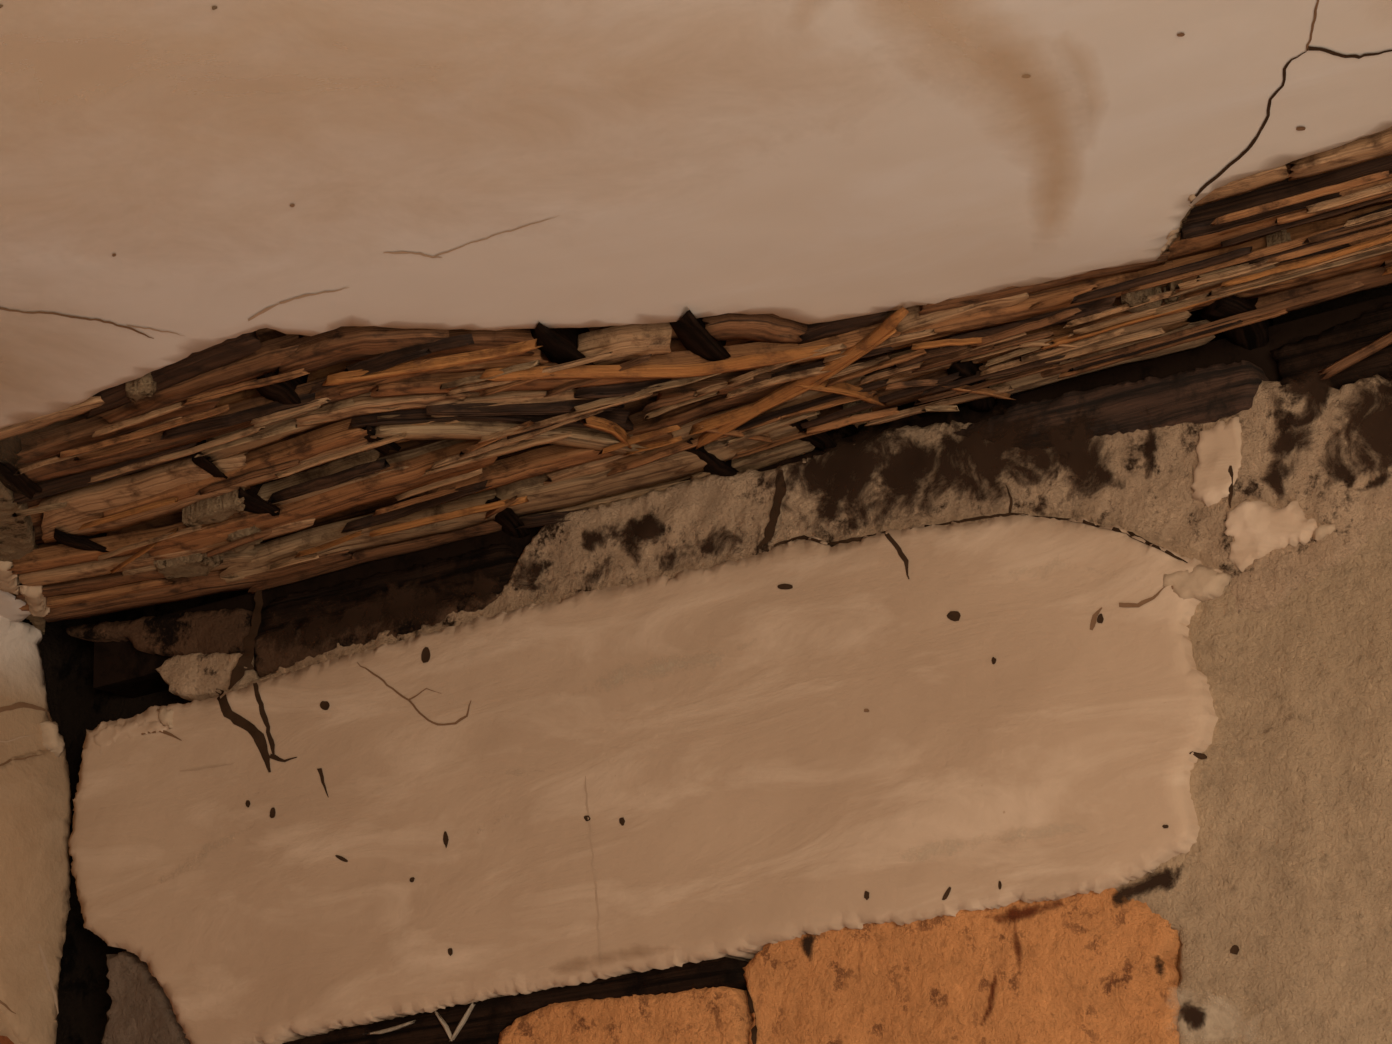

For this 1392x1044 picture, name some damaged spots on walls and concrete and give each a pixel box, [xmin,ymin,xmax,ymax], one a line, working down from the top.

crack [1190,0,1392,203]
crack [0,307,183,339]
spalling [0,482,50,635]
leakage [582,515,744,585]
leakage [767,409,1122,530]
spalling [947,611,961,621]
leakage [1143,425,1157,477]
flaking render [1163,417,1335,601]
leakage [1262,368,1331,499]
leakage [1321,378,1392,490]
crack [141,590,328,796]
crack [357,662,471,725]